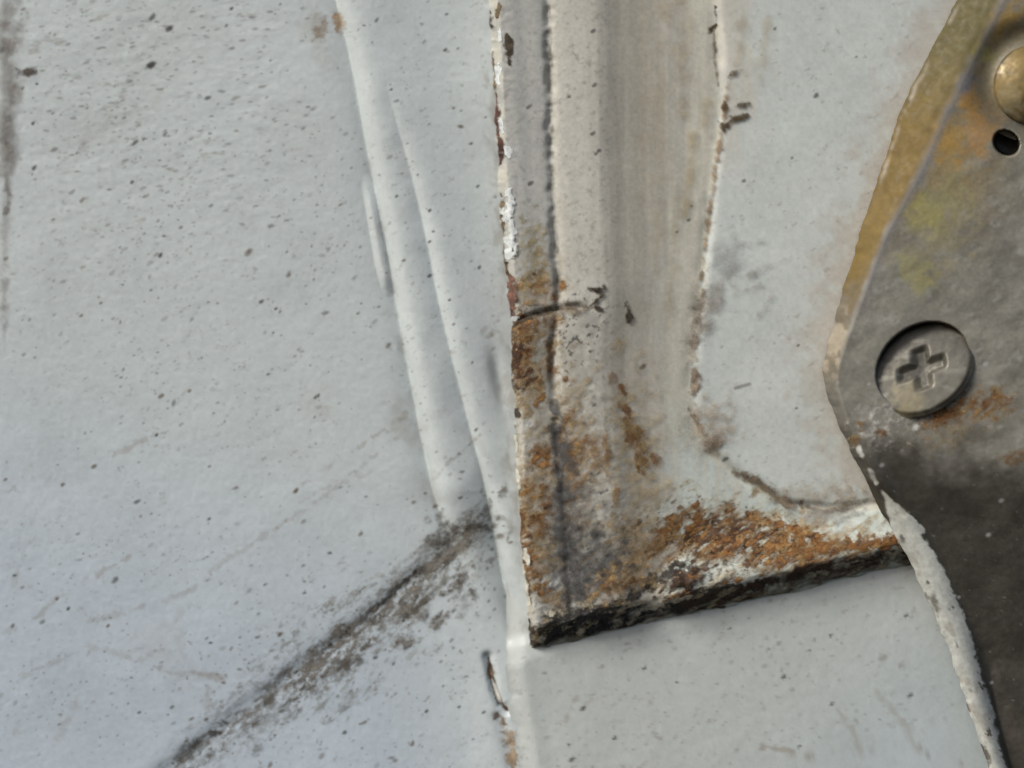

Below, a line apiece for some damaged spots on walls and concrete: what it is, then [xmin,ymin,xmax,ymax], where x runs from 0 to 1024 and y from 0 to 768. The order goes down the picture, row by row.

peeling [489,3,513,166]
peeling [499,188,520,321]
rust [511,229,899,607]
rust [846,388,1014,485]